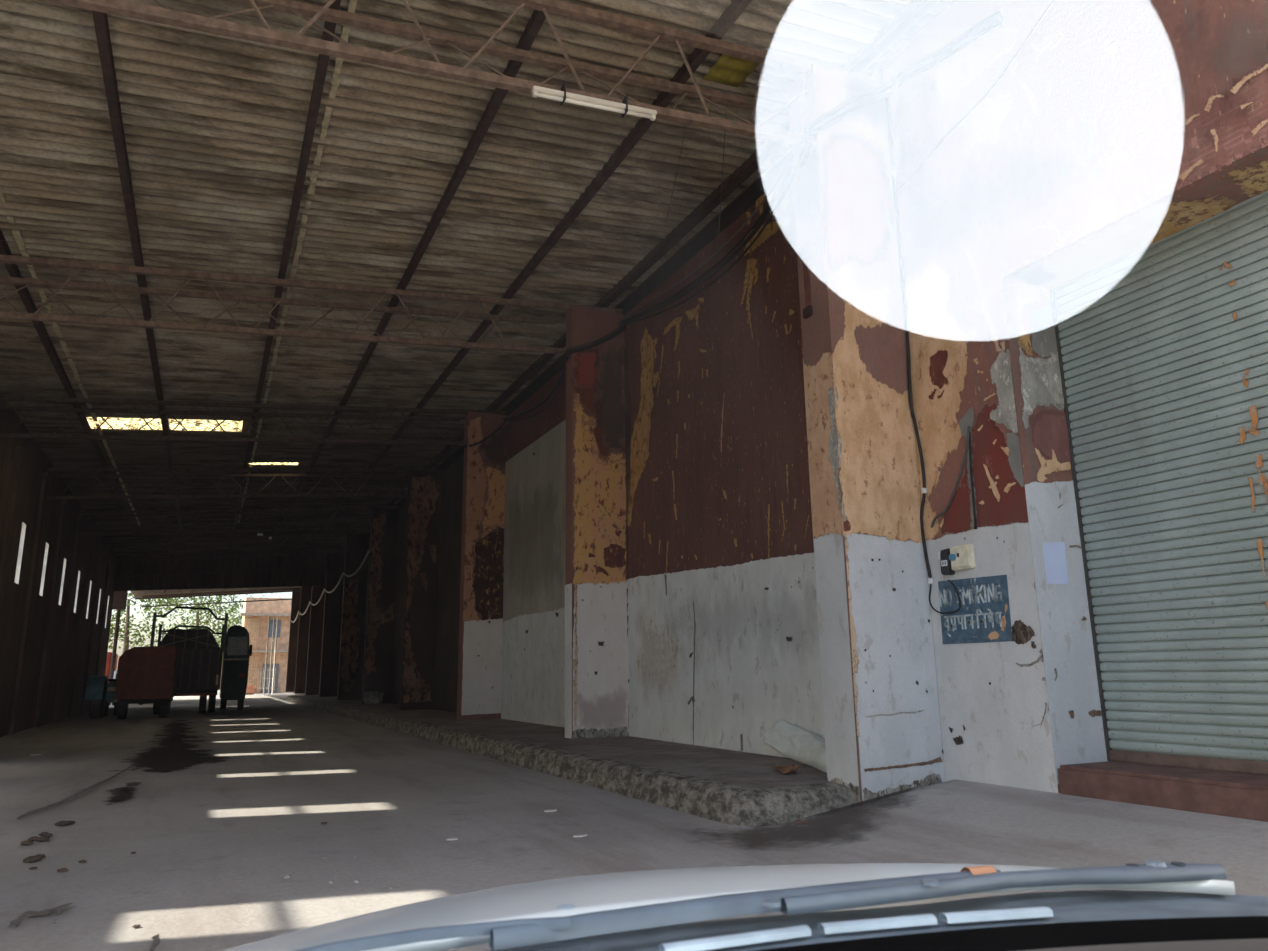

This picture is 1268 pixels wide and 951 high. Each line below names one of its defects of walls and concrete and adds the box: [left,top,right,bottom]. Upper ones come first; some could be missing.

peeling [1185,64,1268,125]
peeling [740,180,790,324]
peeling [981,157,1268,289]
peeling [463,417,505,623]
peeling [573,297,704,587]
peeling [803,264,984,543]
peeling [979,464,1016,505]
peeling [1034,448,1071,482]
corrosion [1239,406,1259,444]
corrosion [1248,454,1268,512]
water stain [107,720,230,802]